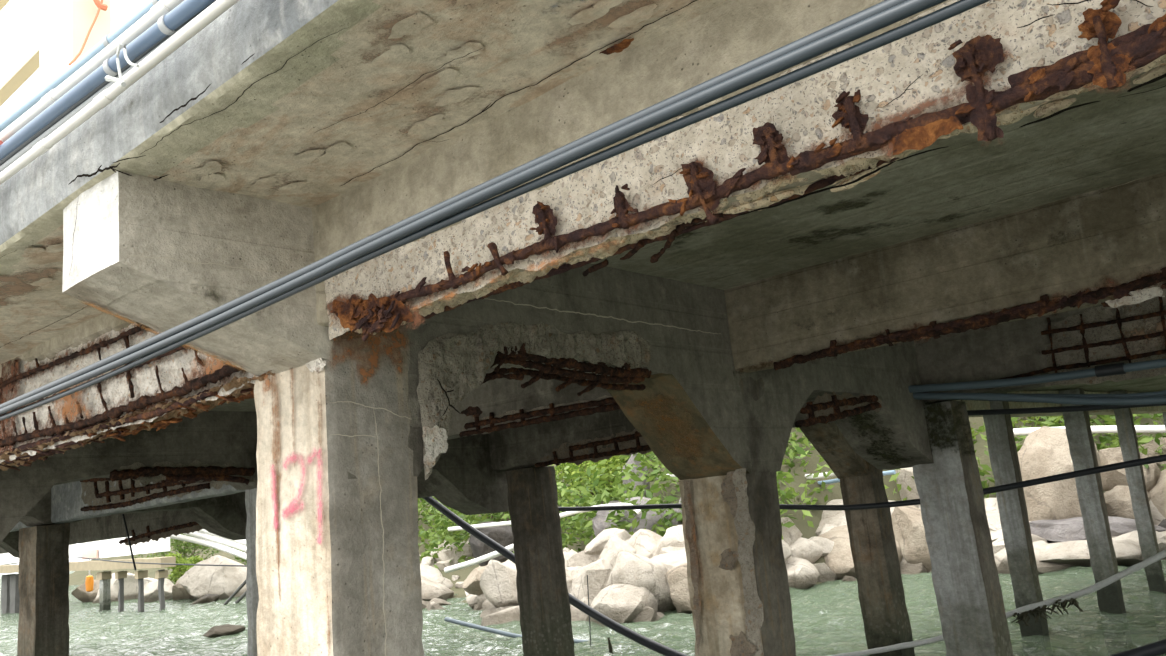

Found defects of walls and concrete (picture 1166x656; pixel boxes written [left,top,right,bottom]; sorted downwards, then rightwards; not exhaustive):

crack [68,28,345,275]
crack [318,0,697,186]
corrosion [529,201,557,236]
corrosion [610,184,630,217]
corrosion [679,158,721,216]
spalling [325,0,1166,341]
corrosion [753,122,792,165]
corrosion [805,34,1008,158]
corrosion [1008,0,1152,90]
spalling [773,267,1166,386]
spalling [0,322,274,471]
spalling [416,322,652,480]